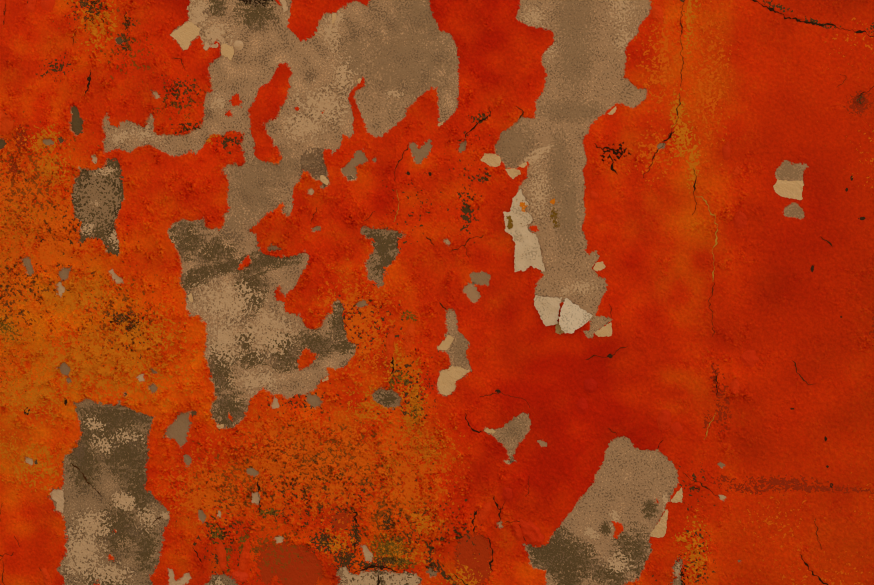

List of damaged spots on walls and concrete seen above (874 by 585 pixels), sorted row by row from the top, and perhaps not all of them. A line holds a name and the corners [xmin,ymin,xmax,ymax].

crack [752,0,874,37]
peeling [71,0,459,429]
peeling [481,0,651,338]
peeling [773,160,808,219]
peeling [437,310,472,396]
peeling [165,411,197,467]
peeling [50,393,192,585]
peeling [522,436,683,585]
peeling [205,574,238,585]
peeling [337,545,438,585]
crack [801,518,828,585]